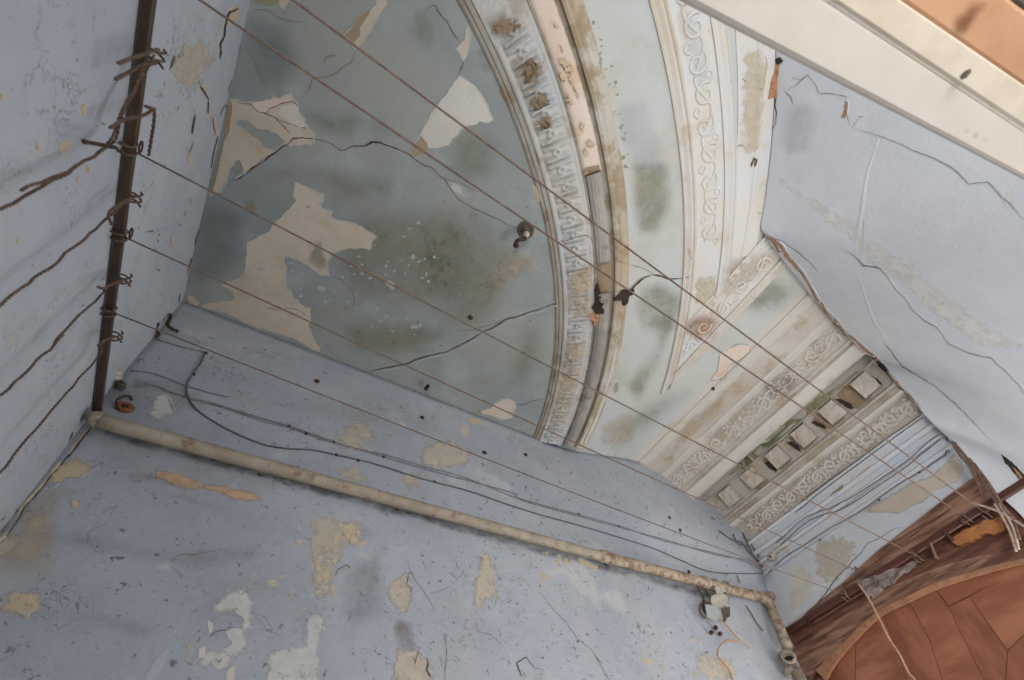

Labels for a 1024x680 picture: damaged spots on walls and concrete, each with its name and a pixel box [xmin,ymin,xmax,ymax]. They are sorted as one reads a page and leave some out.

peeling [209,92,315,197]
peeling [410,75,493,159]
crack [743,57,1023,219]
peeling [187,182,387,352]
crack [367,301,557,373]
crack [841,248,1024,393]
crack [885,344,991,441]
peeling [402,398,517,488]
peeling [867,453,964,514]
peeling [185,588,255,680]
peeling [266,518,365,680]
peeling [789,538,855,610]